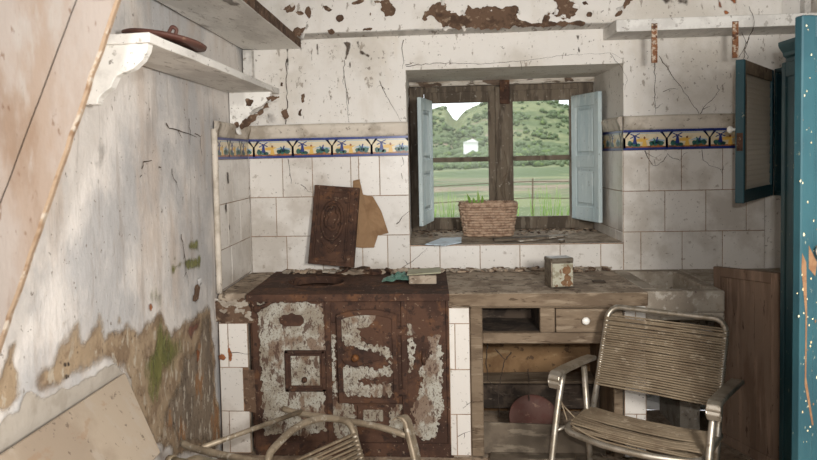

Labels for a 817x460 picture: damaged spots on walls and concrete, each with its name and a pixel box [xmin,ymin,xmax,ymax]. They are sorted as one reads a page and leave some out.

peeling [281,3,311,39]
peeling [323,6,344,35]
peeling [352,0,396,17]
peeling [422,0,592,32]
peeling [615,0,633,17]
crack [654,56,725,114]
damp [38,307,220,455]